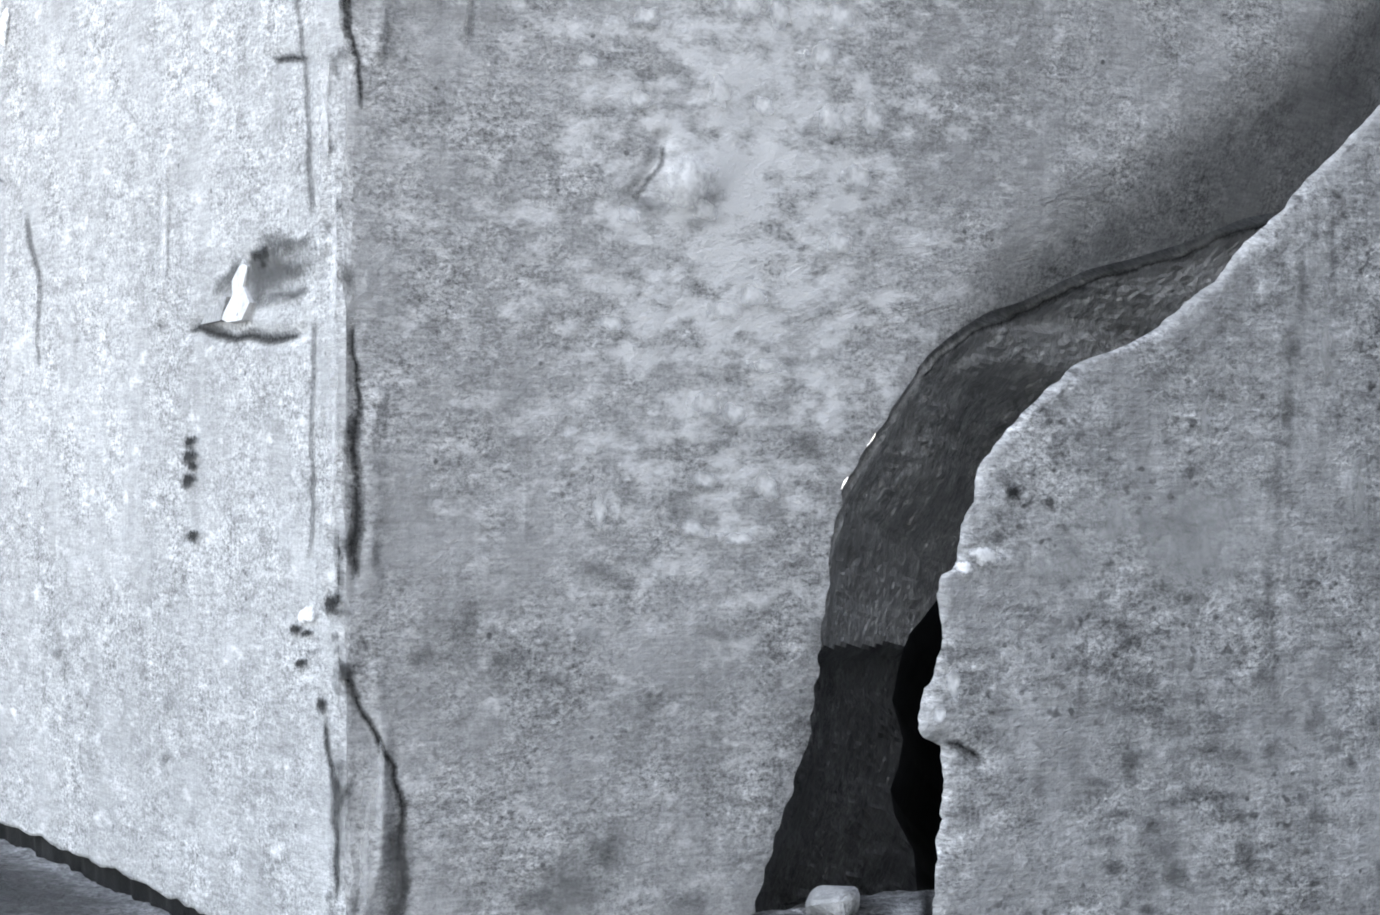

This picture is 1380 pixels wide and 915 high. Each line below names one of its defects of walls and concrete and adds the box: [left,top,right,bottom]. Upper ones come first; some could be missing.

crack [274,0,312,207]
crack [339,0,362,107]
spalling [191,232,308,344]
crack [309,326,363,574]
crack [755,211,1281,915]
crack [323,723,339,895]
crack [339,661,409,915]